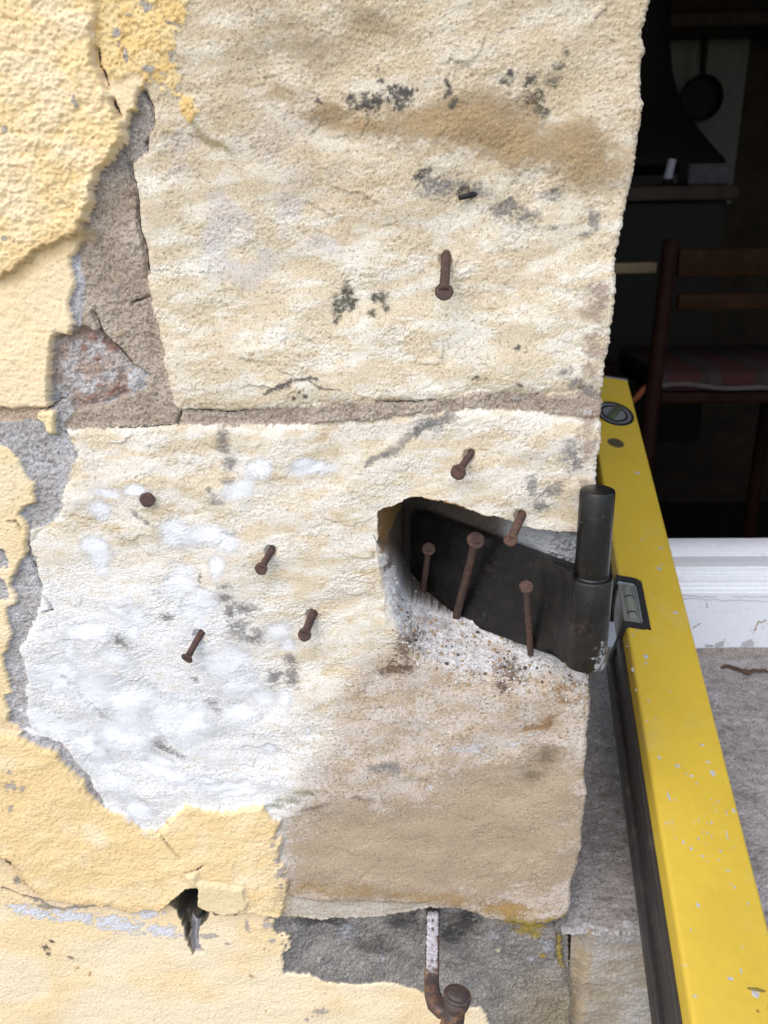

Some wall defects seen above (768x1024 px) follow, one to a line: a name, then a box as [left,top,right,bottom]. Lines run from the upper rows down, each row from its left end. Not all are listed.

water stain [310,50,621,186]
flaking render [37,407,59,434]
spalling [87,484,148,521]
spalling [222,458,274,501]
spalling [80,536,112,575]
spalling [156,518,239,620]
spalling [15,618,295,822]
peeling [269,836,286,887]
peeling [1,877,182,939]